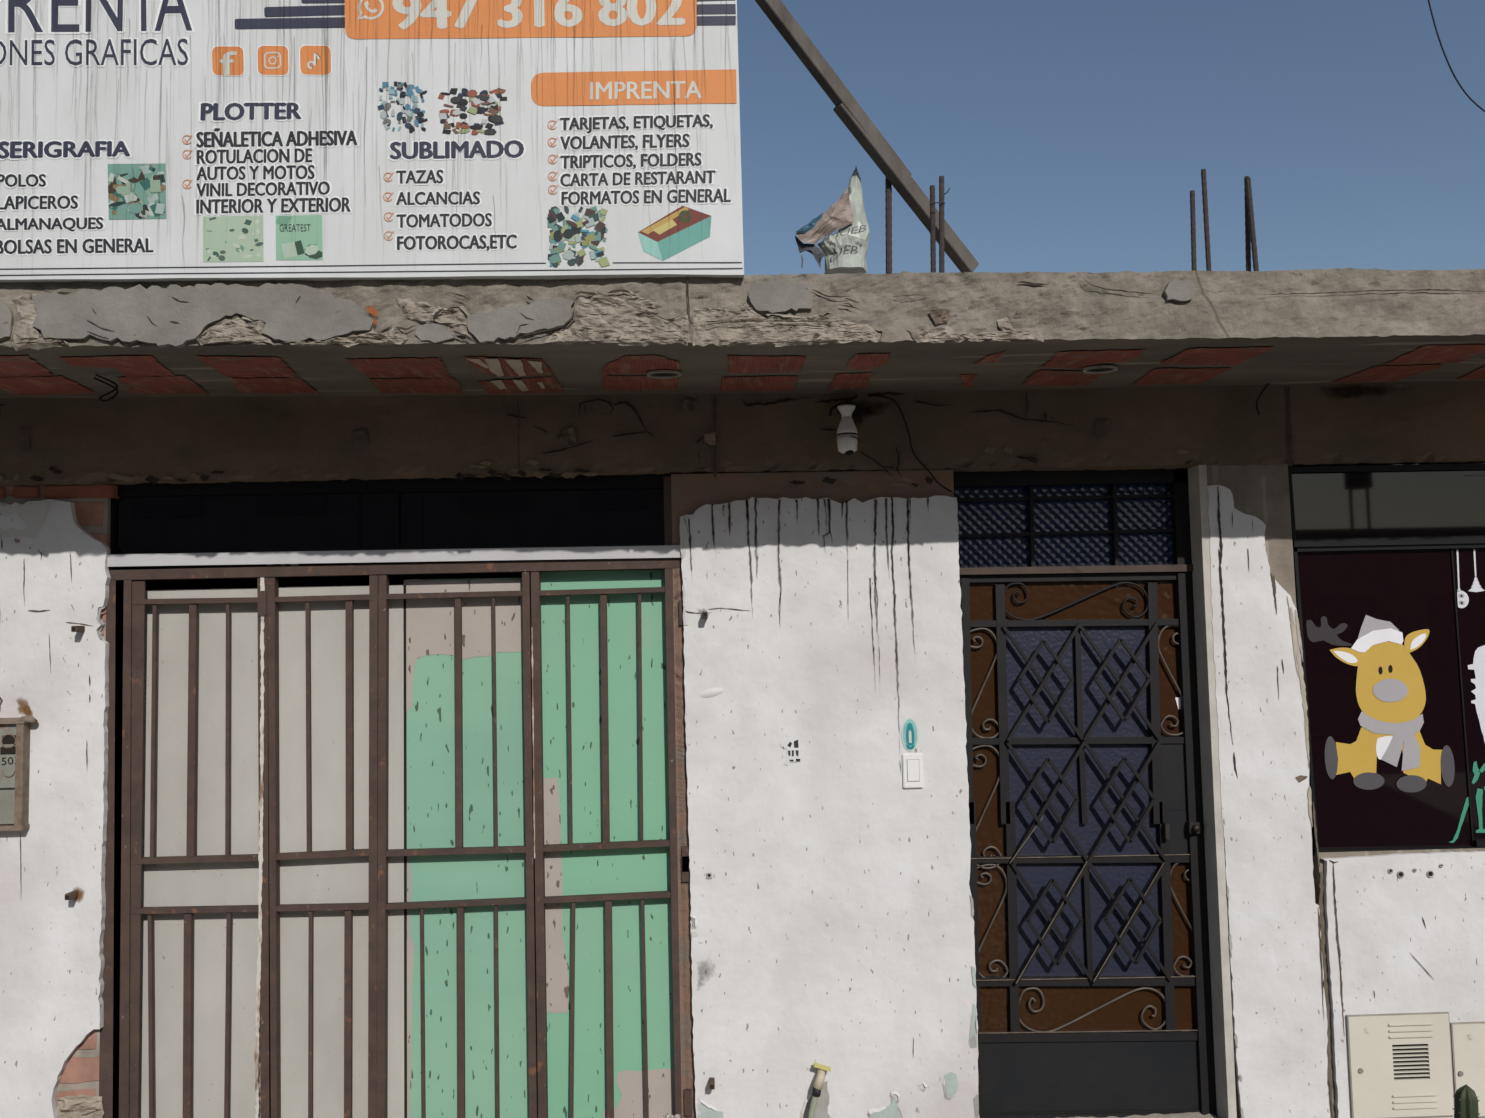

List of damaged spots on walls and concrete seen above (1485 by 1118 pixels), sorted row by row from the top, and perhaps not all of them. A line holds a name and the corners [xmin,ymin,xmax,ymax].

spalling [10,294,71,351]
spalling [197,297,472,347]
peeling [0,501,48,543]
damp [711,498,758,601]
damp [777,499,798,618]
damp [816,499,848,580]
damp [869,497,929,719]
peeling [697,1099,724,1118]
peeling [801,1081,831,1118]
peeling [868,1091,905,1118]
peeling [917,1072,979,1118]